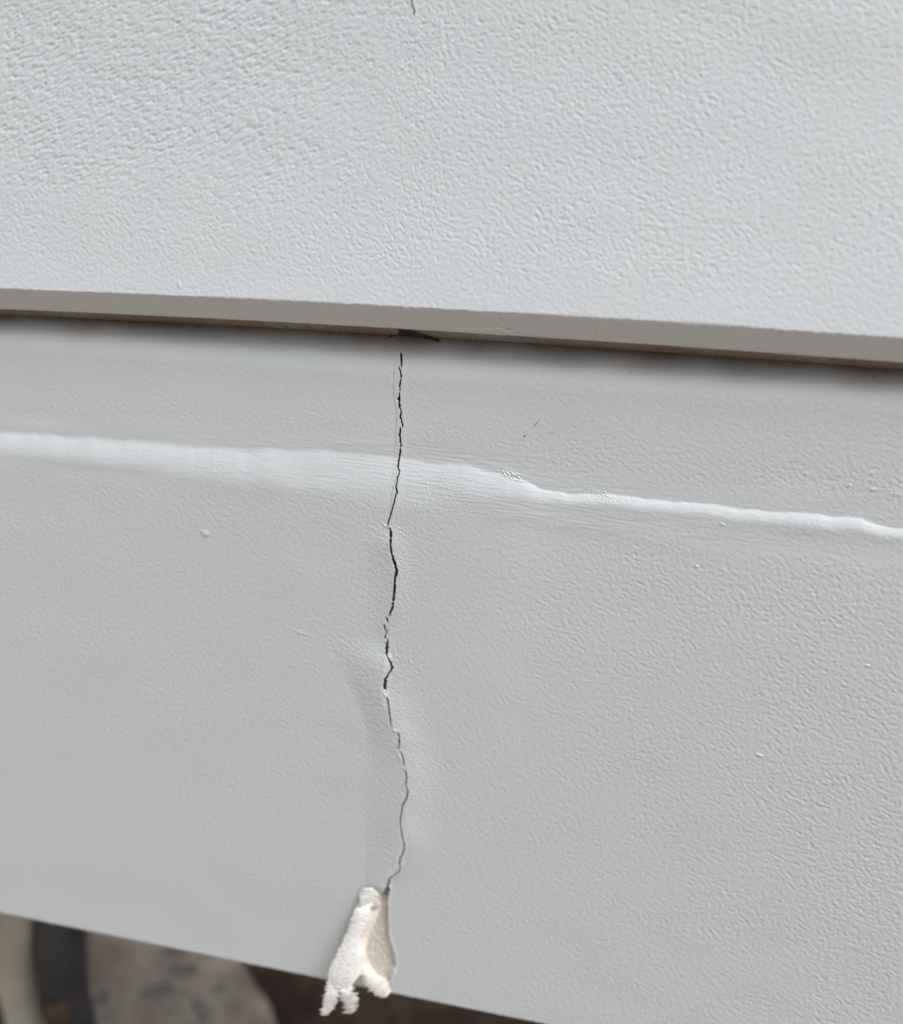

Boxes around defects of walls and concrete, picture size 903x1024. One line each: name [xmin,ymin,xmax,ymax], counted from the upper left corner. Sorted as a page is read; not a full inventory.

crack [381,353,408,895]
peeling [319,882,397,1015]